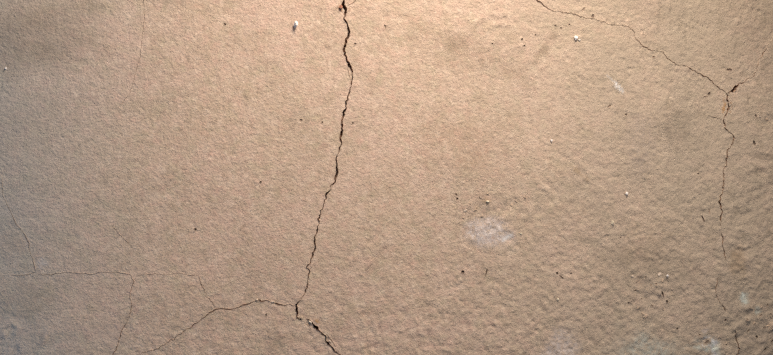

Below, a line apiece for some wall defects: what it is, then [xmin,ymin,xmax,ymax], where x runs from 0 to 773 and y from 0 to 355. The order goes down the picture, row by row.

crack [2,0,356,355]
crack [536,0,773,311]